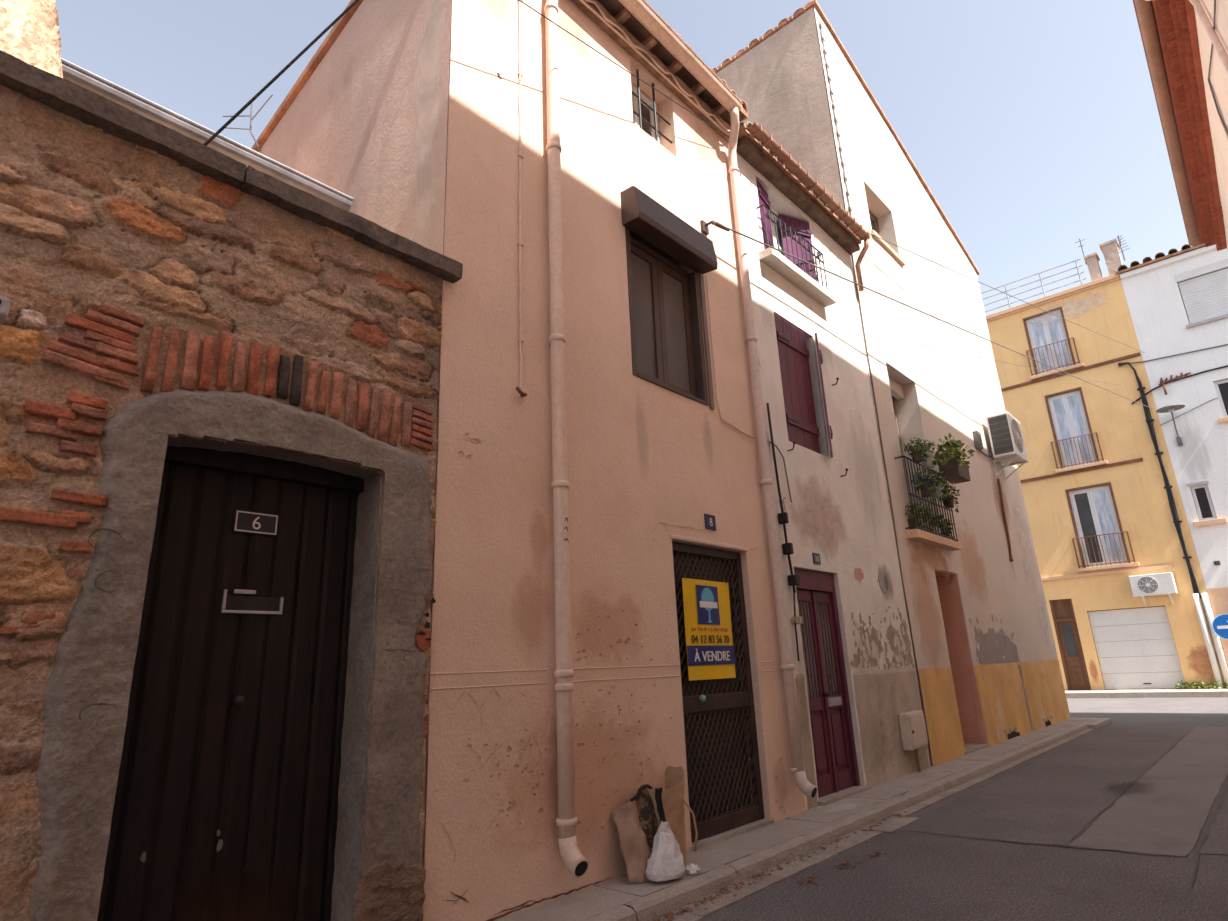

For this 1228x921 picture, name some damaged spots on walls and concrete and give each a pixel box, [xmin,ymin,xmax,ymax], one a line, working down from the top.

peeling [850,606,915,671]
peeling [969,614,1052,740]